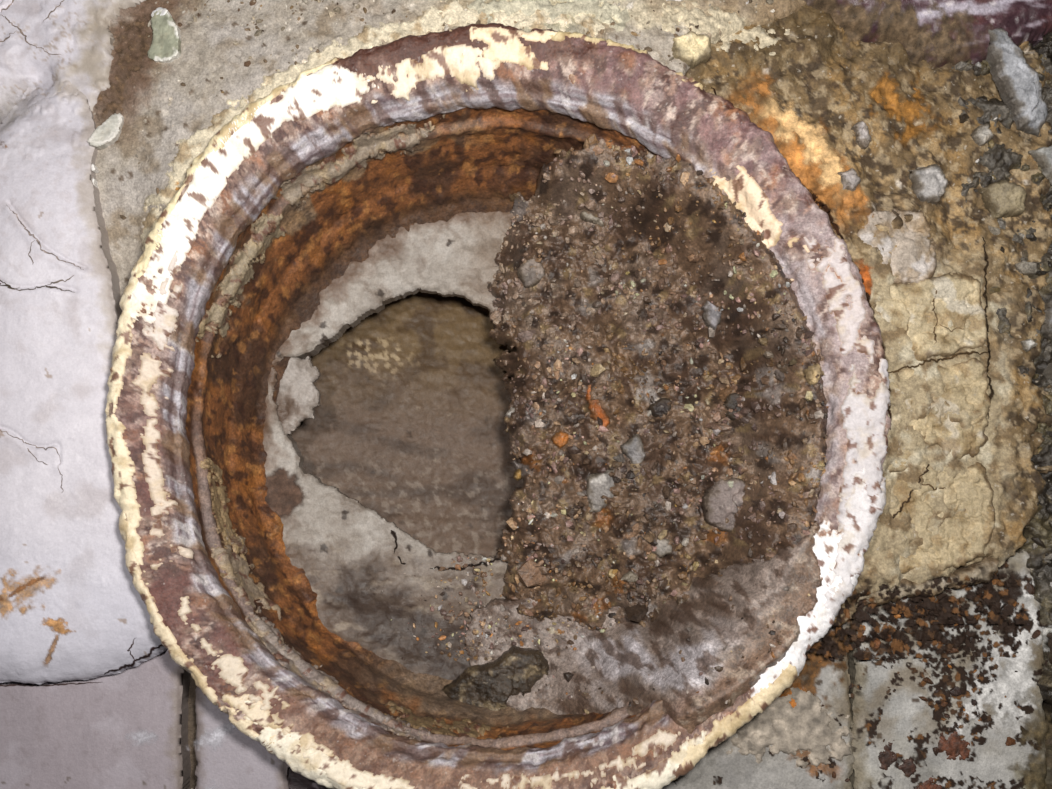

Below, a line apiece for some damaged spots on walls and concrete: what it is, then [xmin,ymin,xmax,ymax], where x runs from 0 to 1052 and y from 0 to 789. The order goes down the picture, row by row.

crack [0,0,64,55]
rust [870,73,933,143]
rust [731,76,867,223]
crack [0,208,84,293]
rust [859,259,872,295]
peeling [105,26,648,789]
crack [0,430,63,490]
rust [265,468,304,517]
spalling [458,165,896,789]
rust [0,570,55,616]
rust [43,618,71,664]
crack [0,638,163,687]